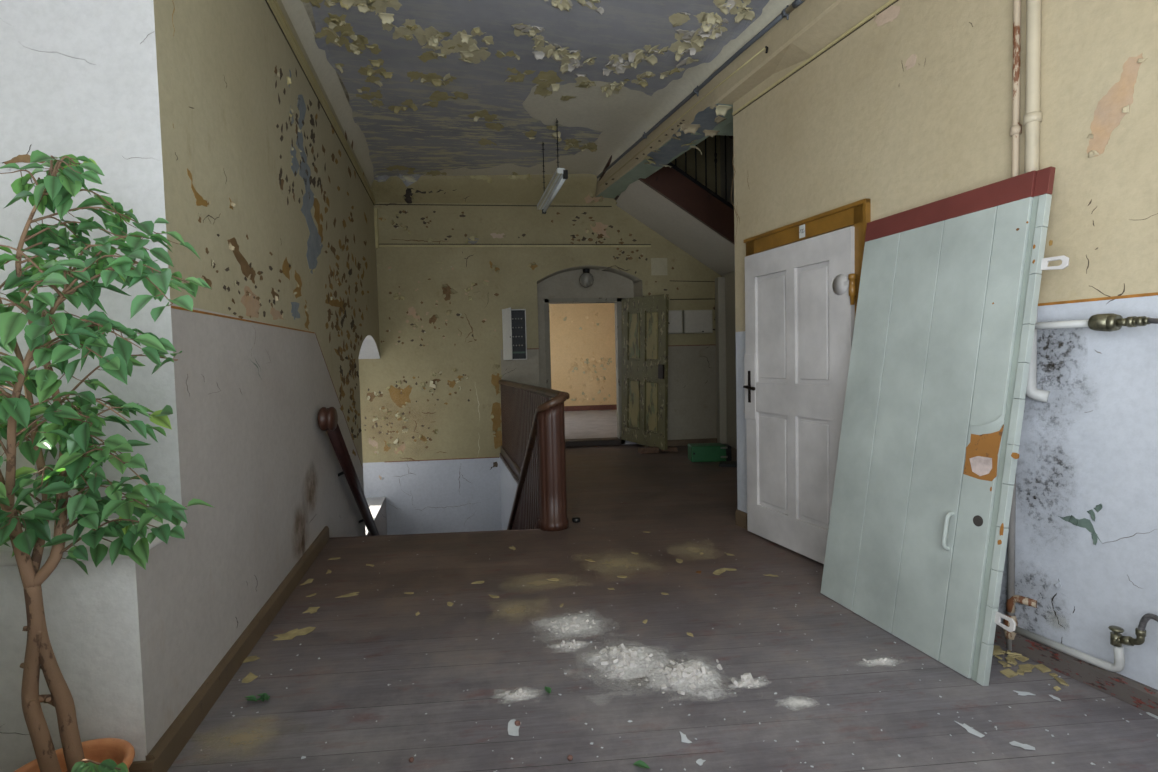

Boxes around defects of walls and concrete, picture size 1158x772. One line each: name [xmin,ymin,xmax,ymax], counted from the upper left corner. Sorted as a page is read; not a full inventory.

peeling [1087,53,1147,158]
peeling [187,169,210,223]
peeling [202,0,769,467]
damp [1037,333,1071,401]
damp [1026,450,1068,507]